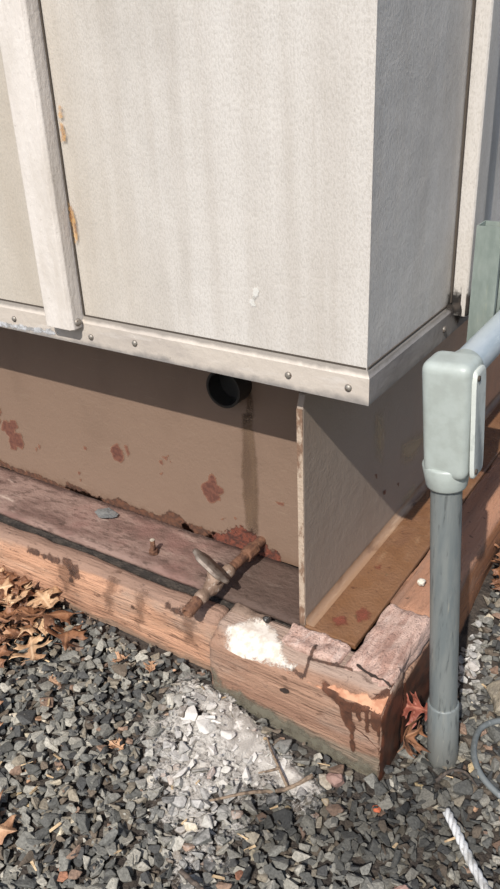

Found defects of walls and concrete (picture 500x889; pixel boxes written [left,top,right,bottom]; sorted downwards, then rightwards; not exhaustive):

peeling [0,460,215,538]
peeling [201,473,224,503]
damp [242,394,257,533]
peeling [27,548,80,583]
crack [285,644,391,687]
damp [212,643,430,781]